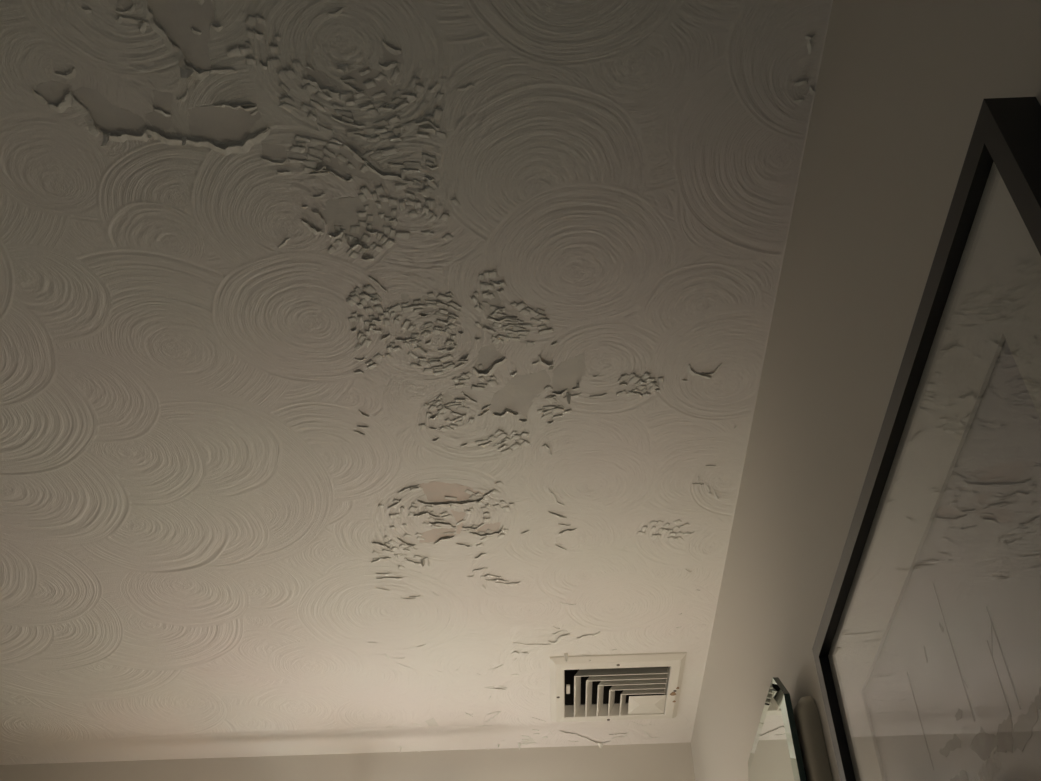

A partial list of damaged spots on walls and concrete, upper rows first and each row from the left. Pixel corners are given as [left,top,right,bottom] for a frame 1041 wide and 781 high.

peeling [32,0,460,261]
peeling [346,271,664,424]
peeling [371,481,520,591]